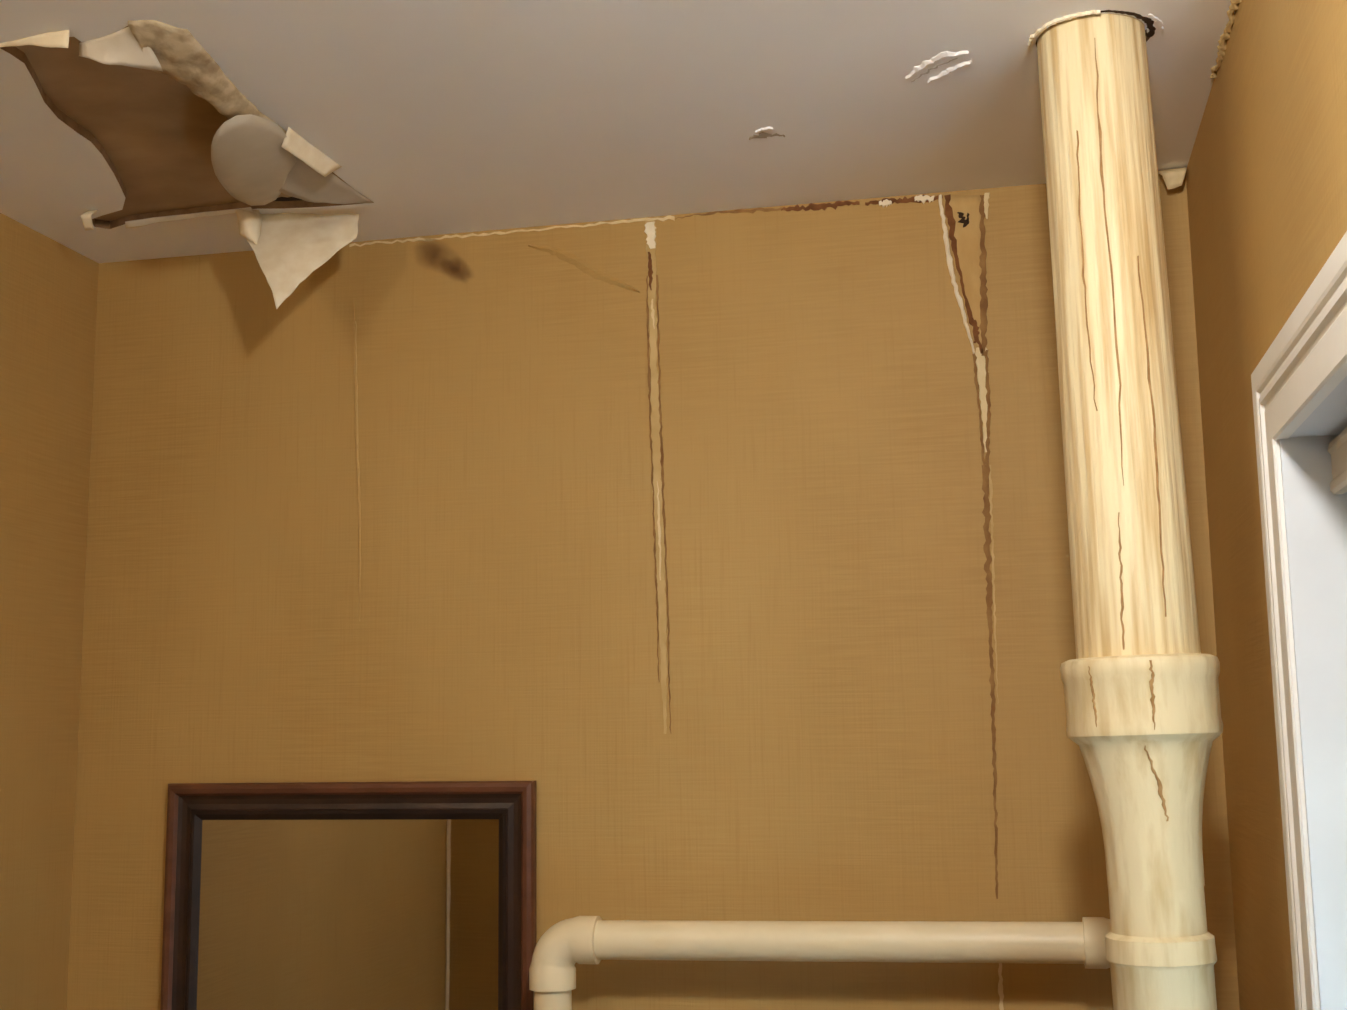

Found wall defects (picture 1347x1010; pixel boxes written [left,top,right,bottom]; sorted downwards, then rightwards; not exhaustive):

peeling [0,30,69,48]
peeling [281,127,342,177]
peeling [80,210,97,231]
crack [1076,47,1169,821]